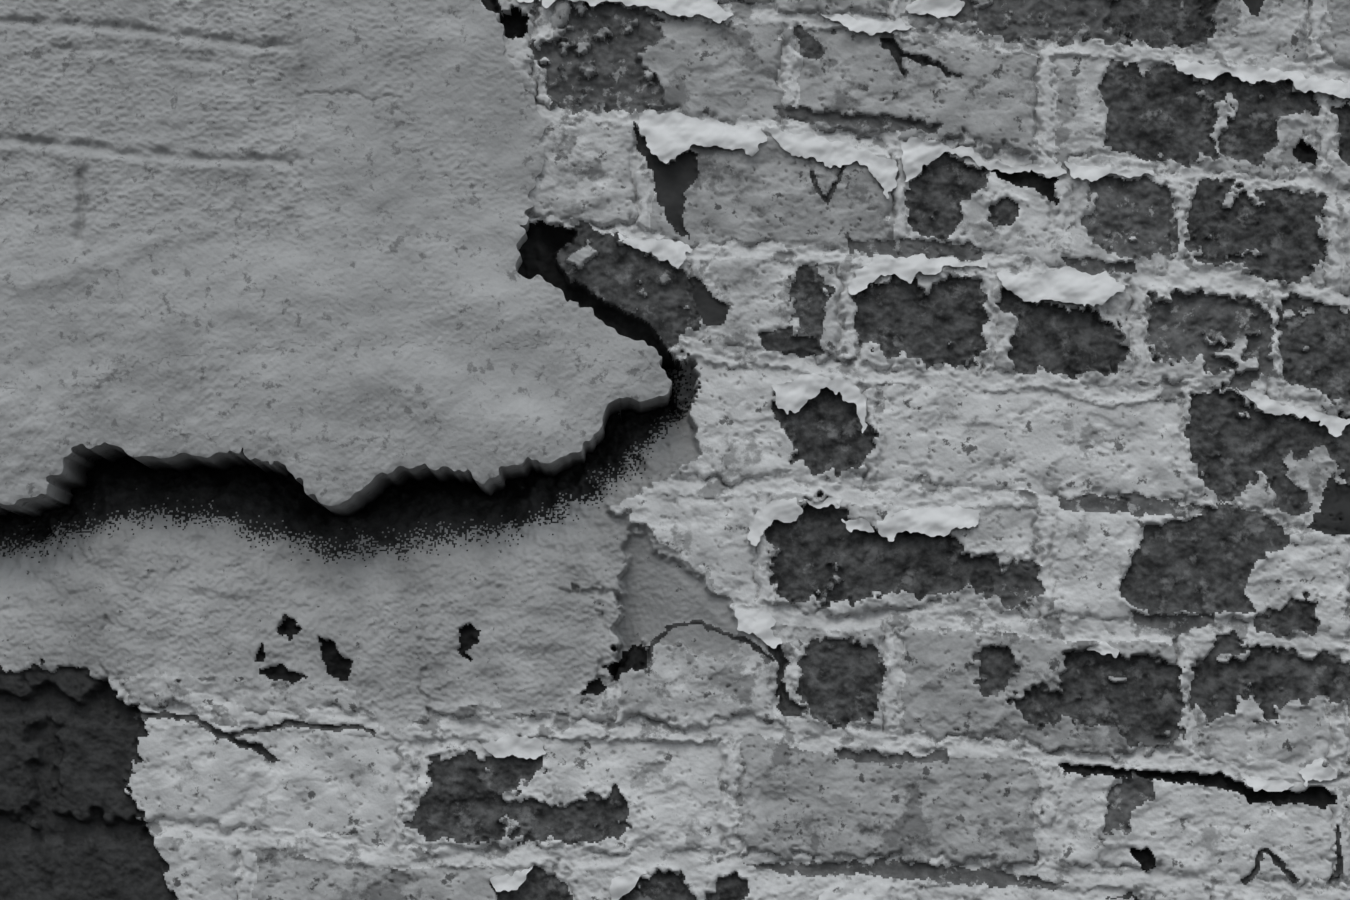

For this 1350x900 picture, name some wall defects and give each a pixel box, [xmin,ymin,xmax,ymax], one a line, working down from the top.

spalling [747,0,1350,748]
flaking render [0,0,767,900]
crack [134,710,376,763]
spalling [1102,771,1156,872]
peeling [1241,758,1337,792]
peeling [818,889,884,900]